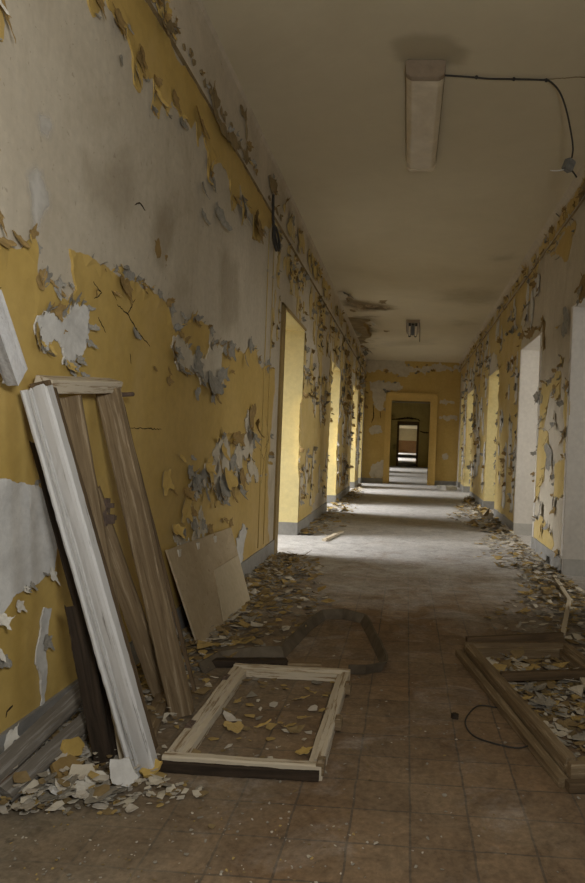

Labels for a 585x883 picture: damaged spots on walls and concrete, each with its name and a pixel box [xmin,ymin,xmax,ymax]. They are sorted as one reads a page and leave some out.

peeling [0,0,16,43]
peeling [0,211,284,754]
peeling [87,0,585,522]
peeling [530,354,571,564]